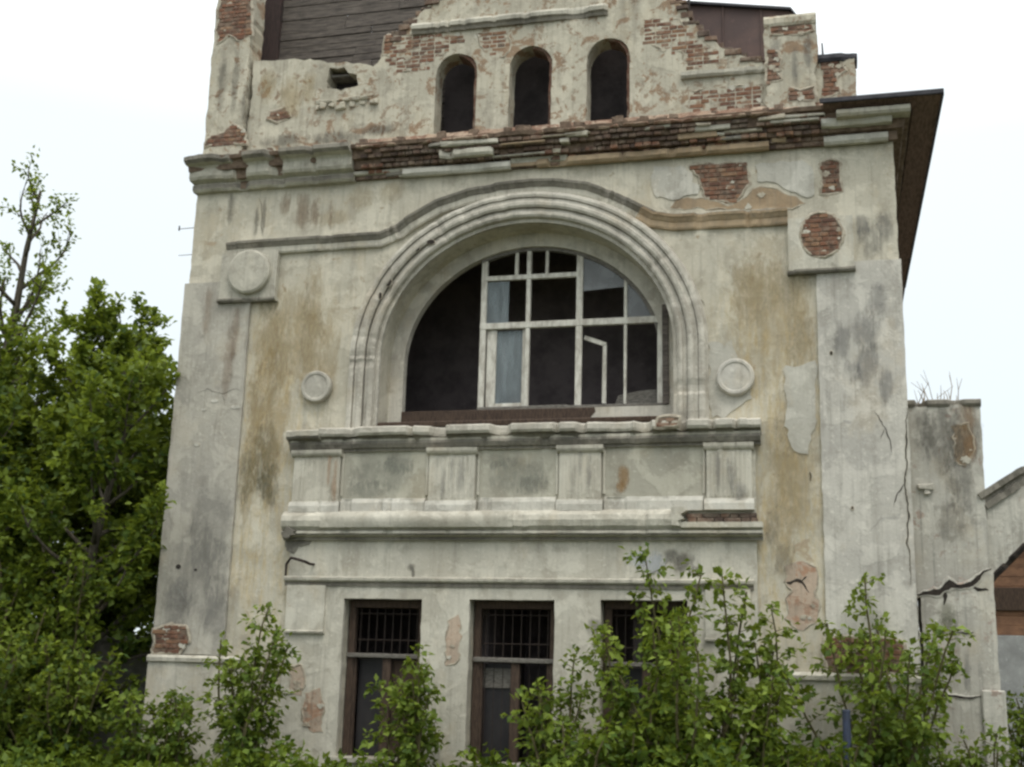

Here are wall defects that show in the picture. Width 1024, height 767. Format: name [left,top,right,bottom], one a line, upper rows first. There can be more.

flaking render [214,0,254,45]
flaking render [380,31,512,73]
flaking render [643,17,719,70]
flaking render [204,123,249,149]
flaking render [670,157,846,259]
flaking render [951,422,976,468]
crack [875,409,992,700]
flaking render [784,560,821,632]
flaking render [150,622,191,655]
flaking render [444,614,463,666]
flaking render [285,663,326,733]